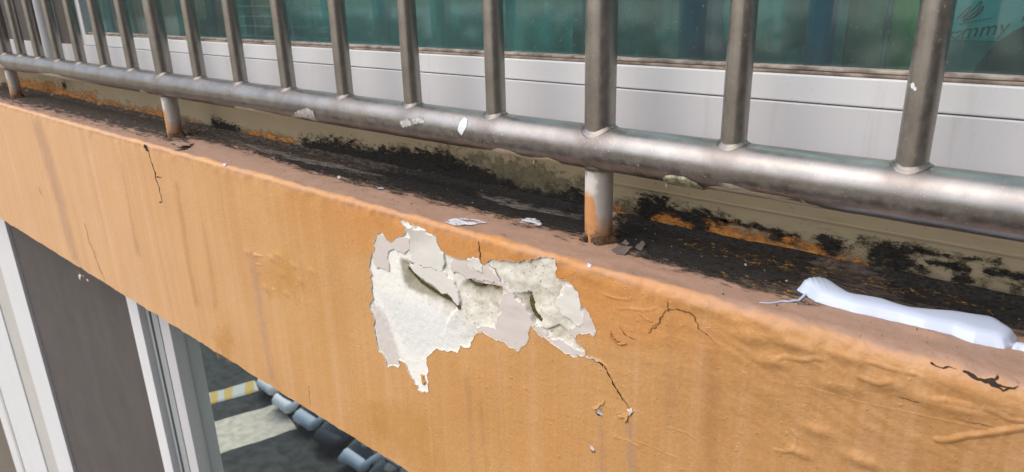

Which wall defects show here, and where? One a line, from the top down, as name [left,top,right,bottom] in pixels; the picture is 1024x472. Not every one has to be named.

rust [19,78,163,117]
crack [144,144,162,203]
damp [0,83,585,237]
damp [613,191,1024,337]
rust [651,213,1002,315]
peeling [369,219,597,393]
crack [648,302,718,345]
crack [585,355,633,423]
crack [930,362,1018,391]